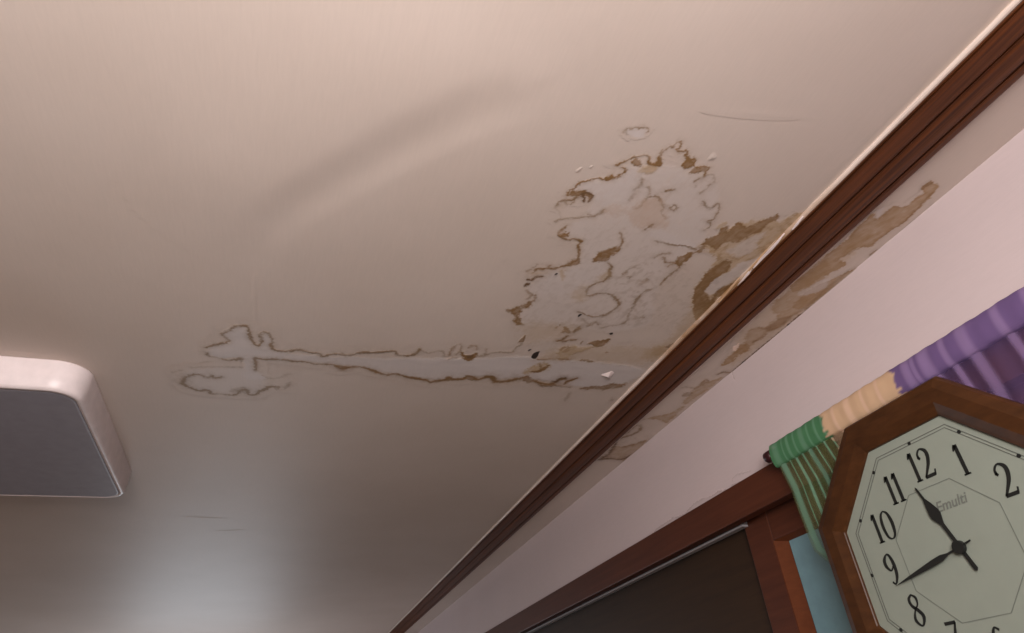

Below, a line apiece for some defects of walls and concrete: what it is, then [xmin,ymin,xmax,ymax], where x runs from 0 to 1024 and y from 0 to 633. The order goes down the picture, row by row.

water stain [163,121,808,405]
water stain [595,179,941,463]